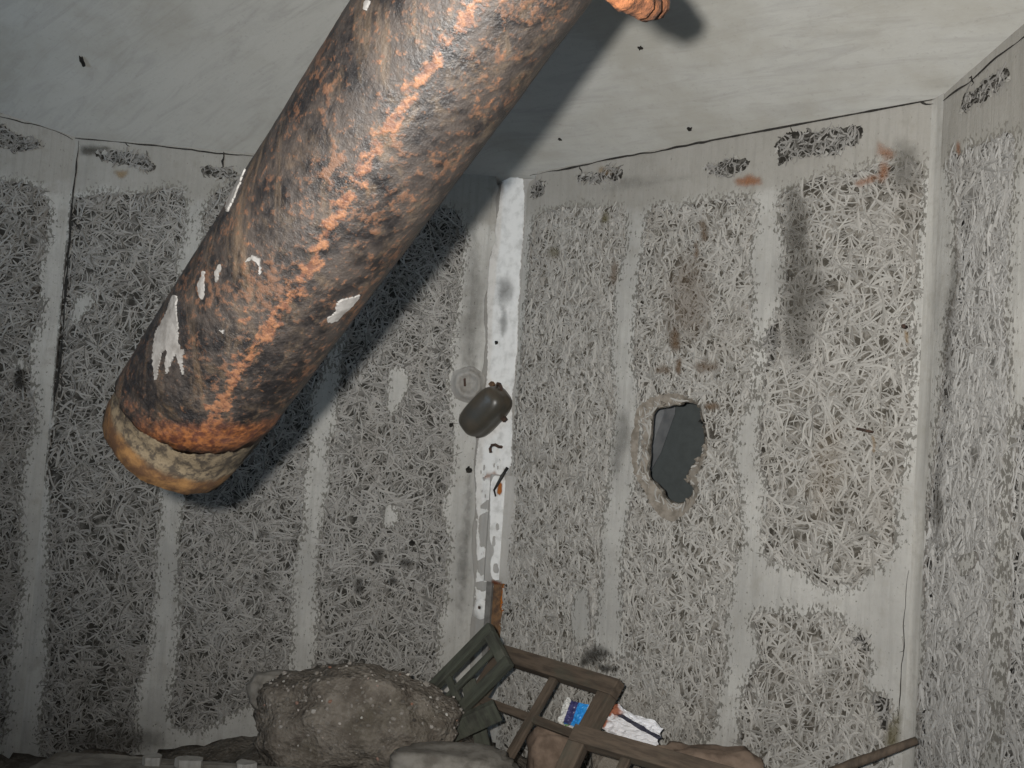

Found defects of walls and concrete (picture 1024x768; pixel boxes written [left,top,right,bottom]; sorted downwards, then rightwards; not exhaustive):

spalling [958,62,1011,114]
spalling [702,155,750,179]
spalling [774,122,863,167]
spalling [630,393,708,521]